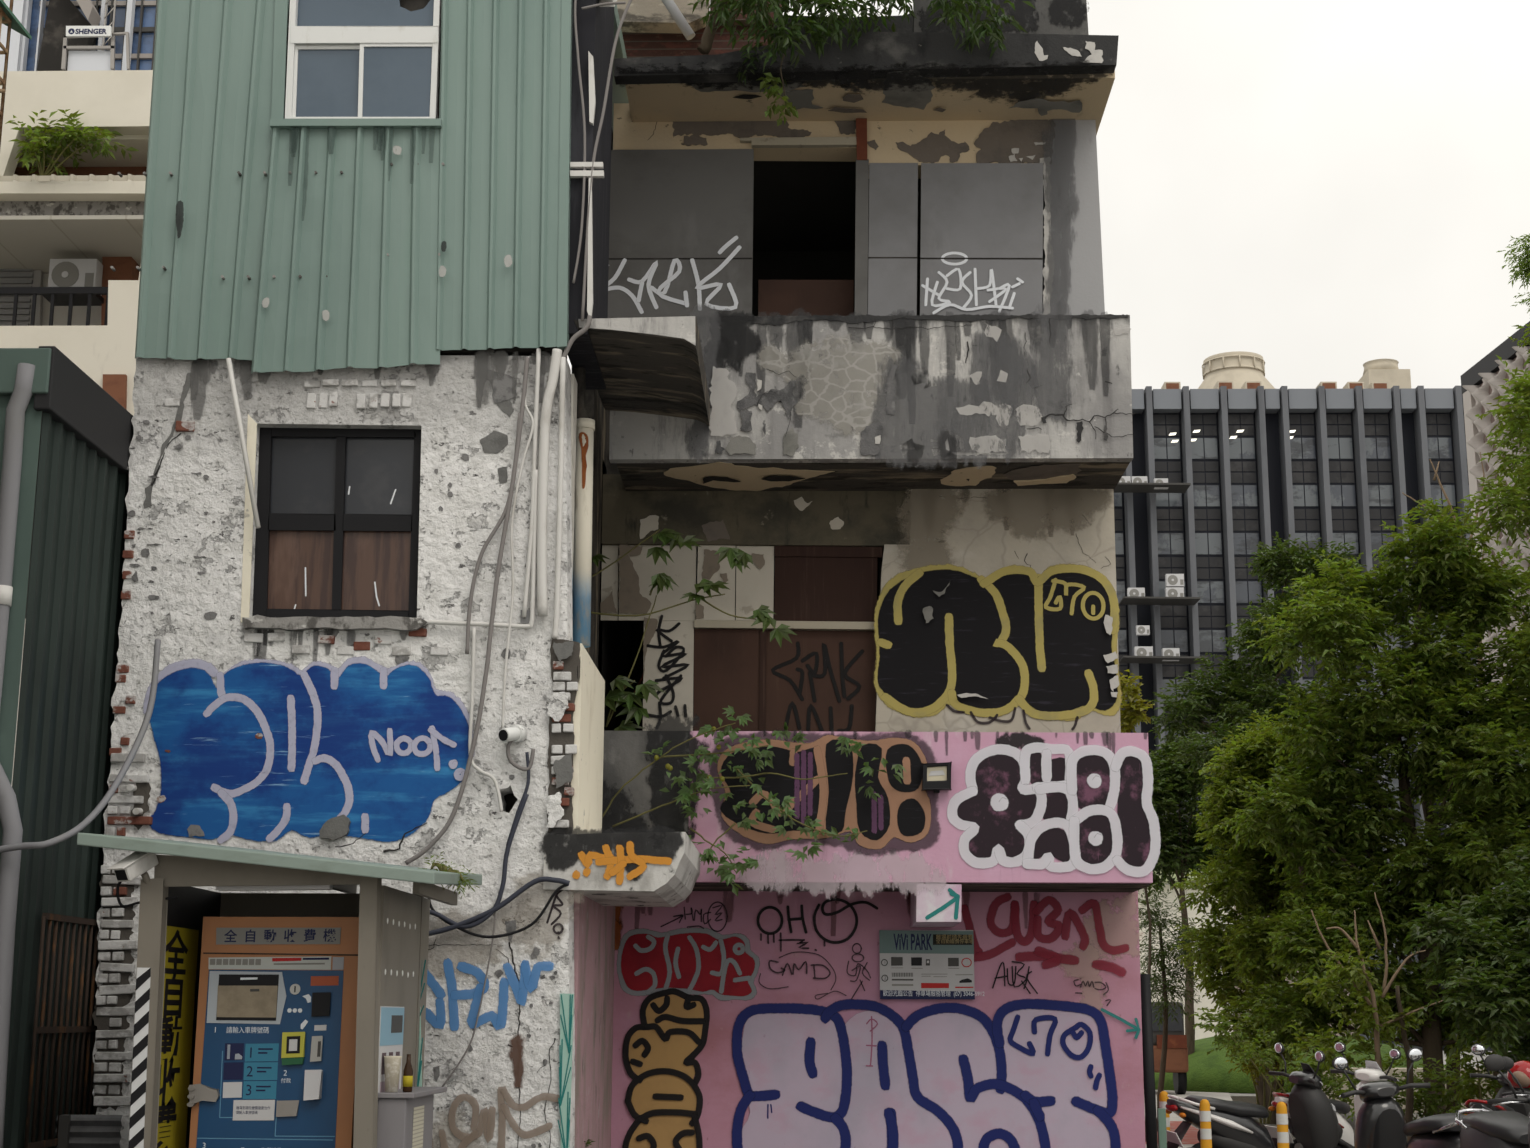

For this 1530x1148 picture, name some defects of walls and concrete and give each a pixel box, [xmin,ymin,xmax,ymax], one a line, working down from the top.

damp [615,59,1113,103]
peeling [672,71,1082,308]
damp [872,119,1079,468]
damp [190,358,271,420]
flaking render [304,379,416,409]
damp [474,349,550,407]
damp [685,304,761,462]
peeling [664,366,835,511]
spalling [940,402,1082,486]
crack [1027,381,1136,439]
flaking render [244,628,448,665]
flaking render [93,865,142,1106]